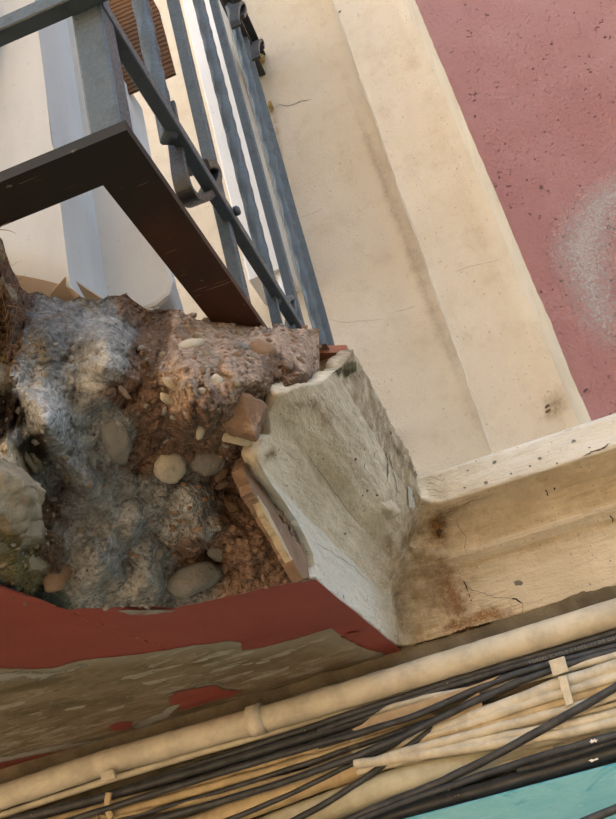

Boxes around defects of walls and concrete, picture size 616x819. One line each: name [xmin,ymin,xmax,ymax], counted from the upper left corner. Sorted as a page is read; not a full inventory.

spalling [0,222,322,615]
rust [444,579,511,631]
peeling [0,628,387,763]